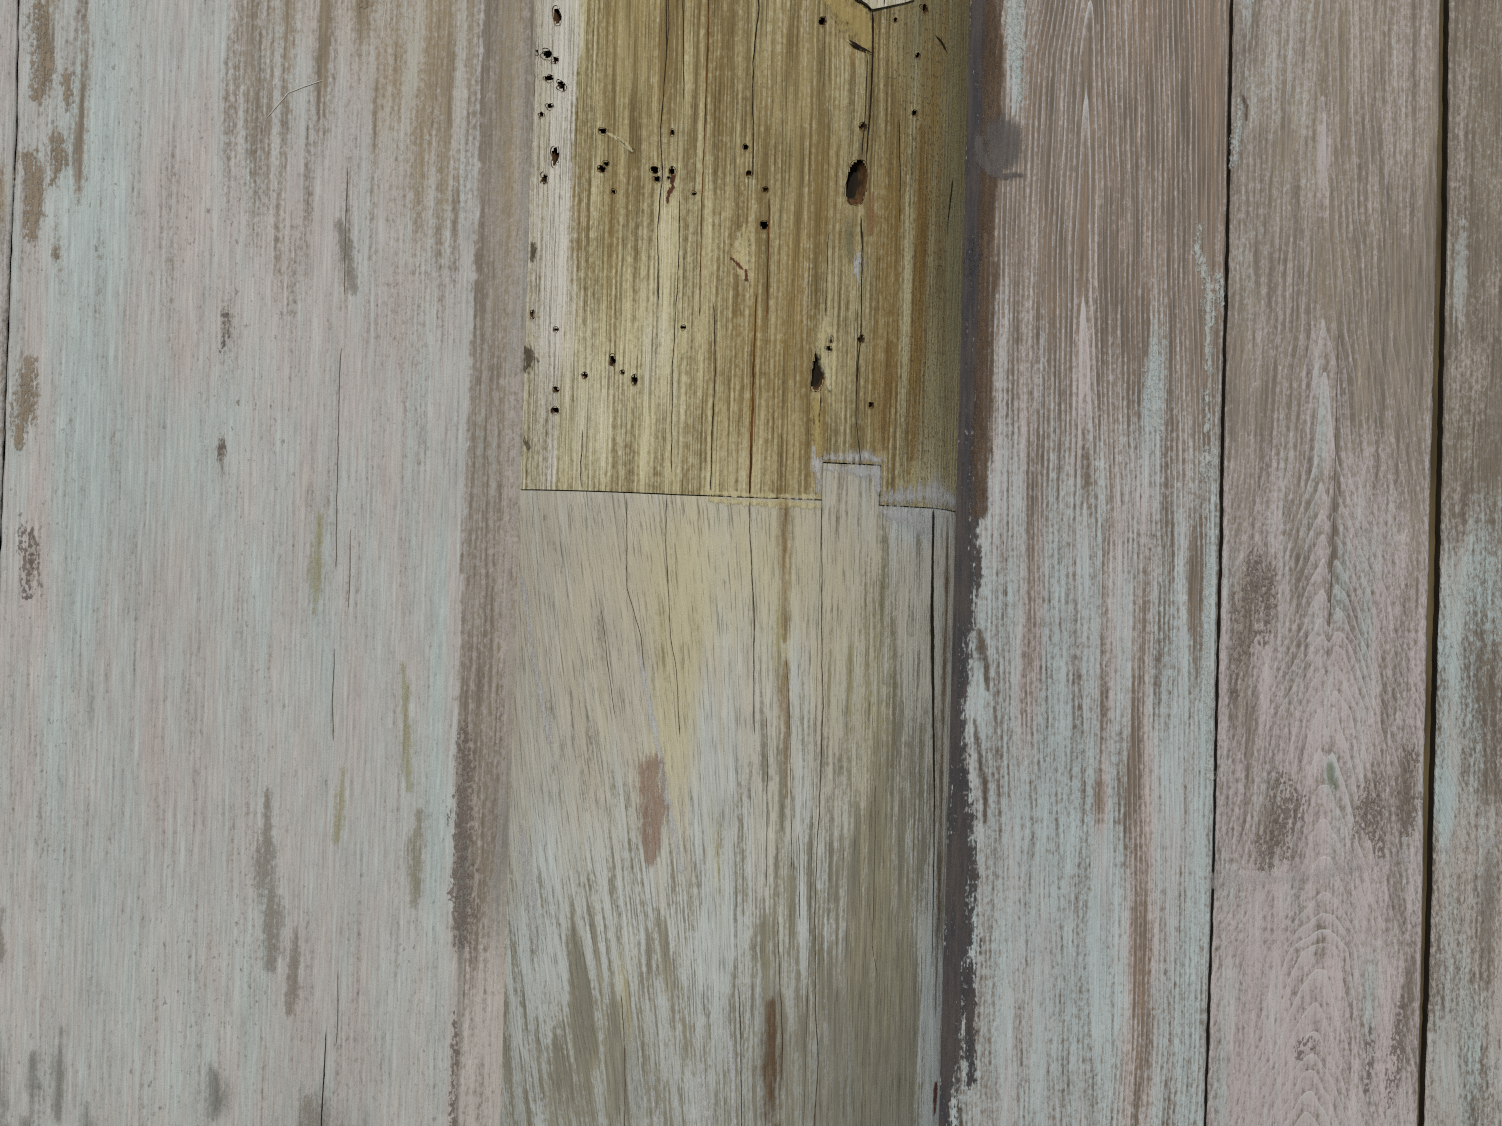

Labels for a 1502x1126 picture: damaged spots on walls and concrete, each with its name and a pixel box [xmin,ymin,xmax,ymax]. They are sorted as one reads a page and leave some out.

crack [928,510,936,955]